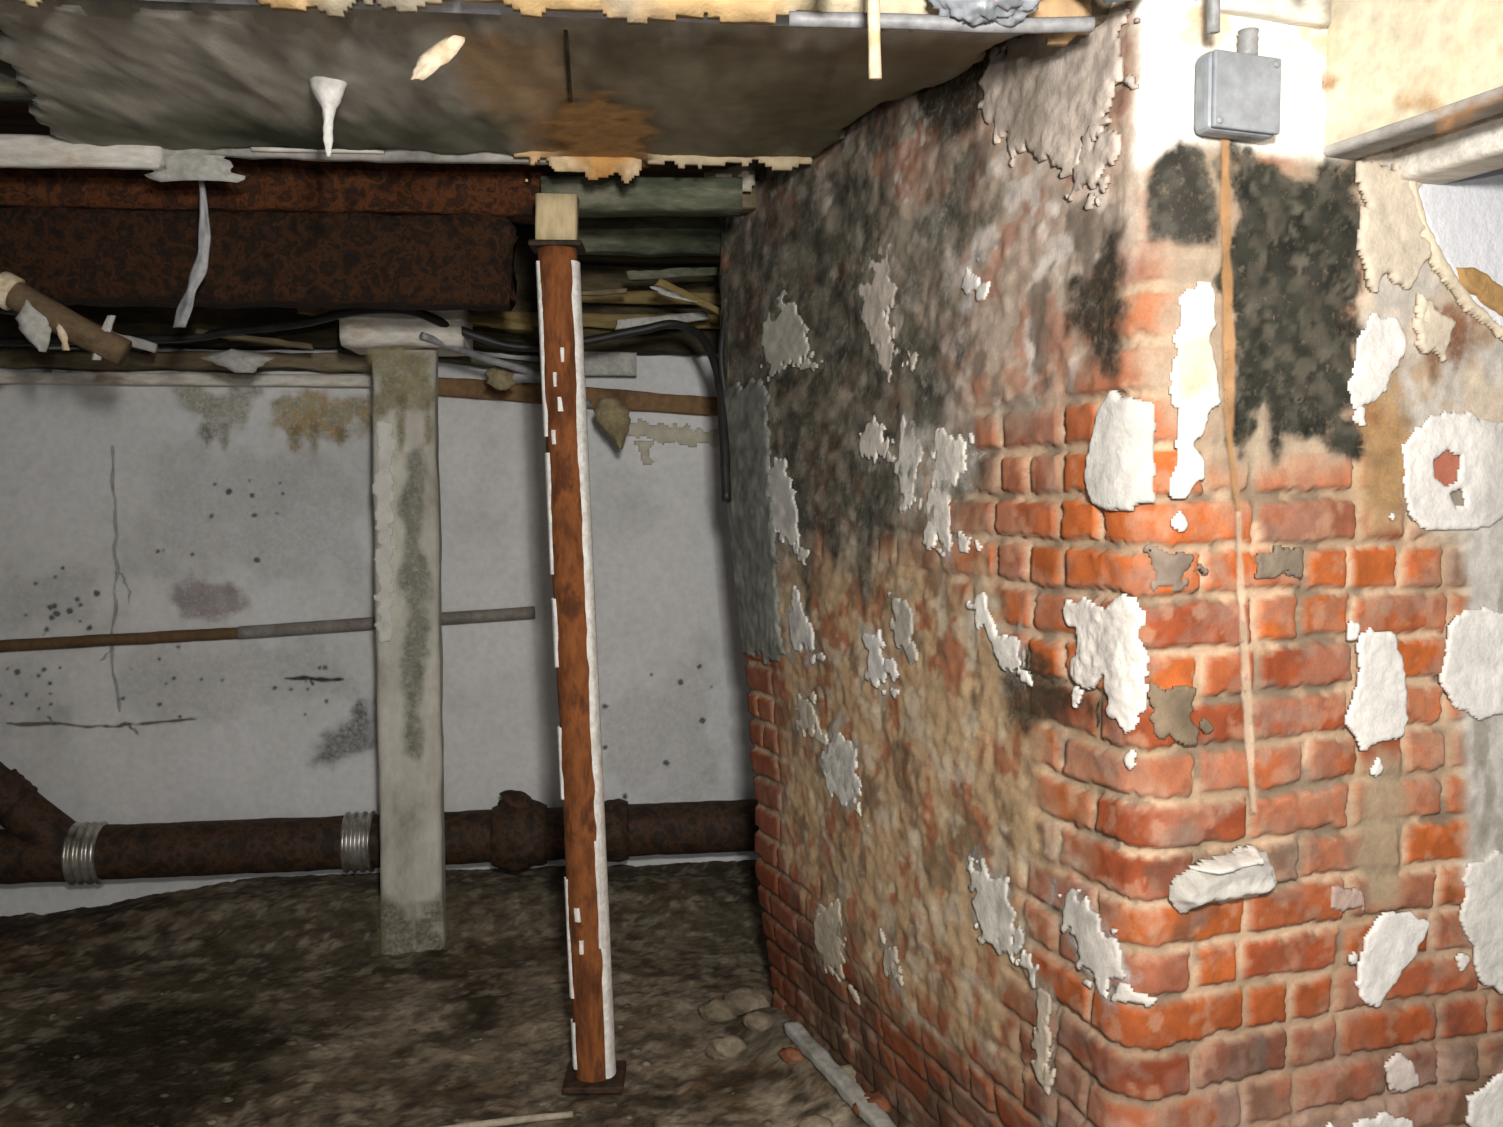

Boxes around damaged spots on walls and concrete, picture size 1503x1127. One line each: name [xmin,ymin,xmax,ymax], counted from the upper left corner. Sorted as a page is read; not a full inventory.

leakage [512,91,656,184]
mould [720,56,997,614]
mould [1066,232,1124,375]
leakage [1147,140,1411,507]
peeling [1351,406,1367,426]
peeling [1355,161,1503,362]
crack [7,446,193,733]
leakage [274,346,433,759]
peeling [1016,666,1033,687]
flaking render [1062,544,1214,770]
peeling [1170,511,1188,532]
peeling [1110,981,1157,1007]